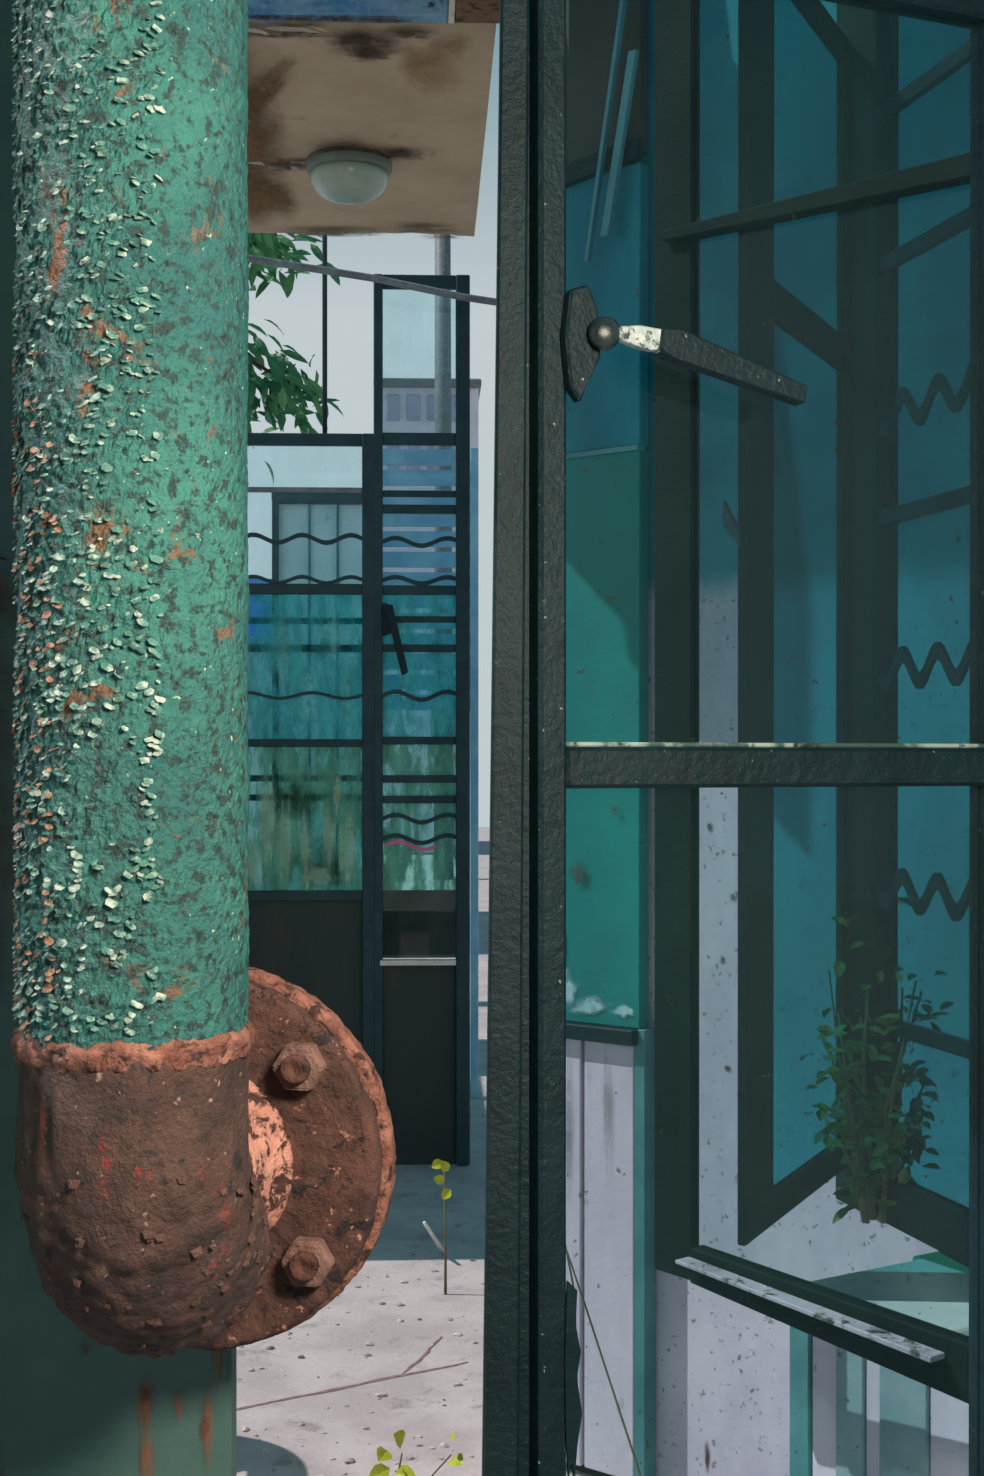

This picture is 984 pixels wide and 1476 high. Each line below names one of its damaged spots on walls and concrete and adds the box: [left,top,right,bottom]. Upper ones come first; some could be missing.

damp [248,0,461,80]
damp [247,66,306,219]
damp [320,143,435,159]
damp [400,227,456,238]
peeling [566,973,633,1017]
corrosion [202,1405,212,1451]